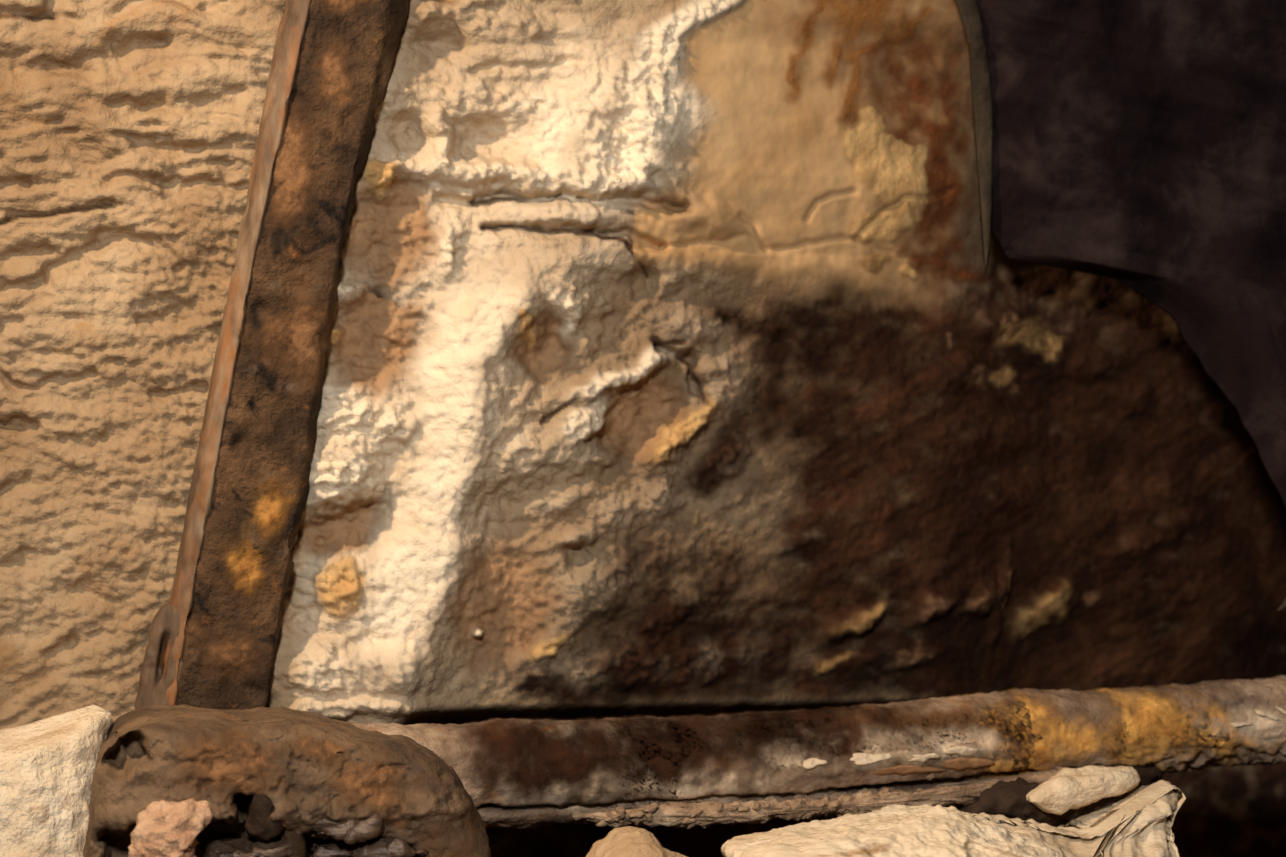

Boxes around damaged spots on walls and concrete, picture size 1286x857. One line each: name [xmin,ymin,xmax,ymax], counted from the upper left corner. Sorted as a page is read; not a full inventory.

corrosion [321,52,349,97]
corrosion [272,122,310,217]
crack [470,197,648,278]
corrosion [267,281,332,375]
water stain [688,310,830,495]
corrosion [256,489,288,528]
corrosion [228,542,261,588]
corrosion [211,639,251,672]
water stain [517,619,718,706]
corrosion [685,751,736,777]
corrosion [825,689,1256,774]